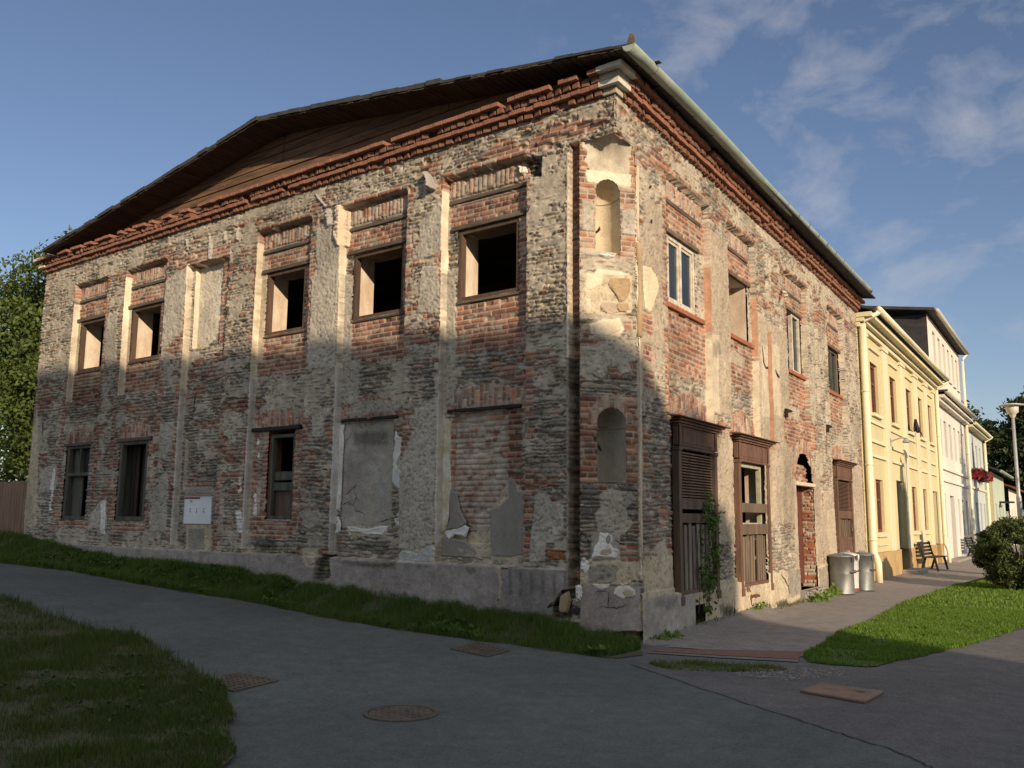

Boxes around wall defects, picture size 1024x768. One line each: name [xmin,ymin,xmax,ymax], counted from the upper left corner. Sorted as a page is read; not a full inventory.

peeling [335,425,399,536]
peeling [392,431,402,488]
peeling [569,532,636,614]